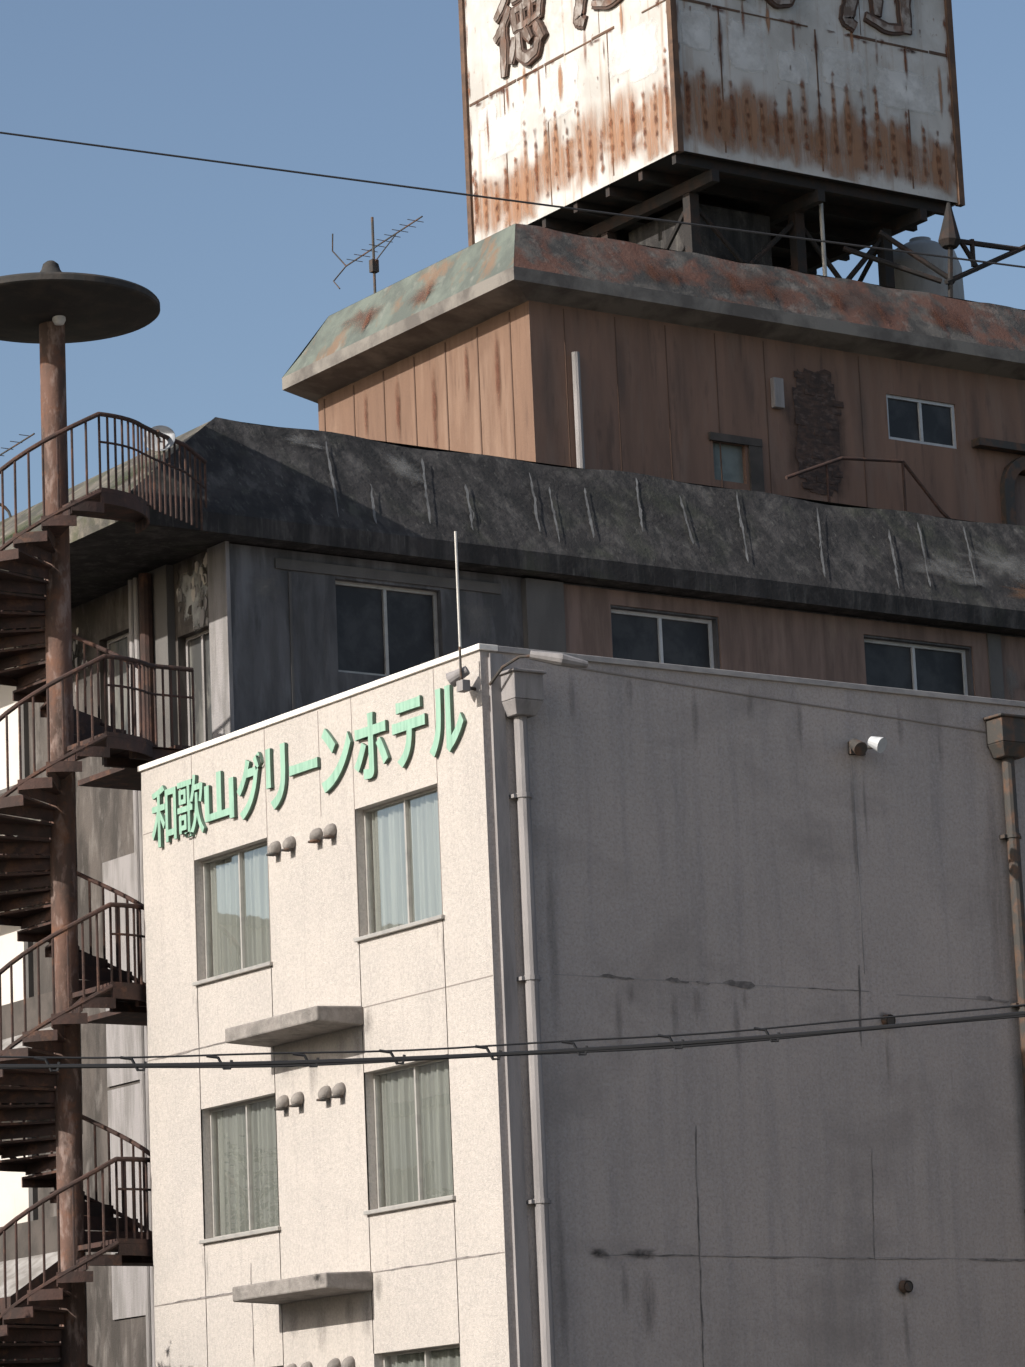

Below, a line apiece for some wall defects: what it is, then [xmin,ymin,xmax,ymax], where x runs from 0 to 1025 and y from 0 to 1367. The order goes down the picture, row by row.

rust [766,9,800,47]
rust [814,30,883,61]
rust [468,43,955,231]
spalling [792,368,844,496]
peeling [174,552,209,627]